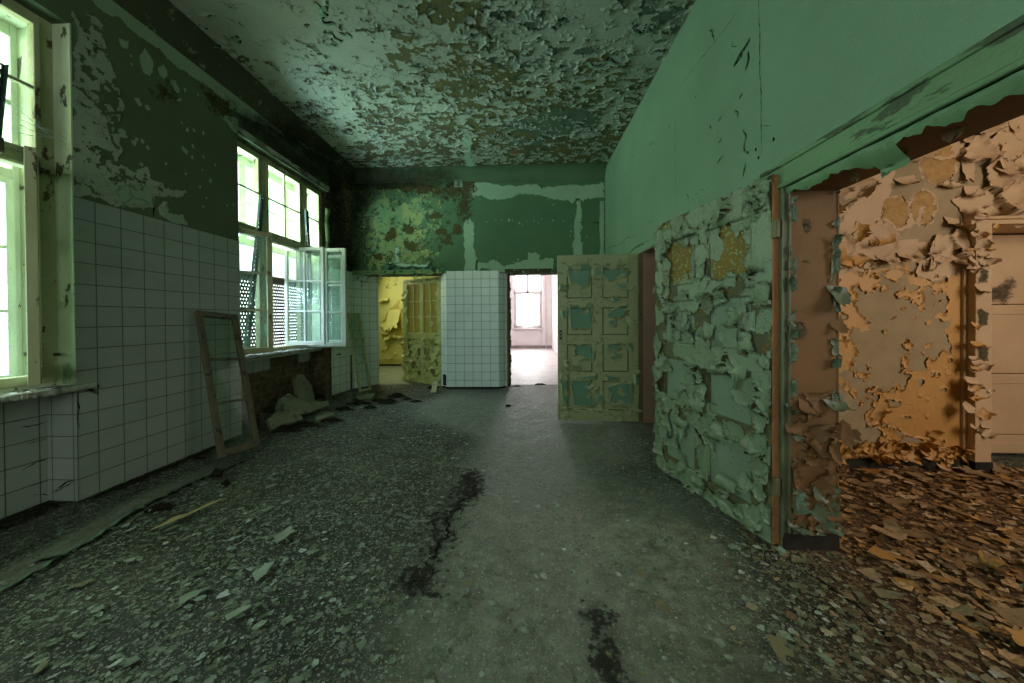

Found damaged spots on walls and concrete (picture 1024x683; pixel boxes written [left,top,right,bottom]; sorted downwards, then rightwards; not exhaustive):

peeling [71,0,446,425]
peeling [180,0,695,169]
peeling [462,175,808,563]
flaking render [785,115,1024,538]